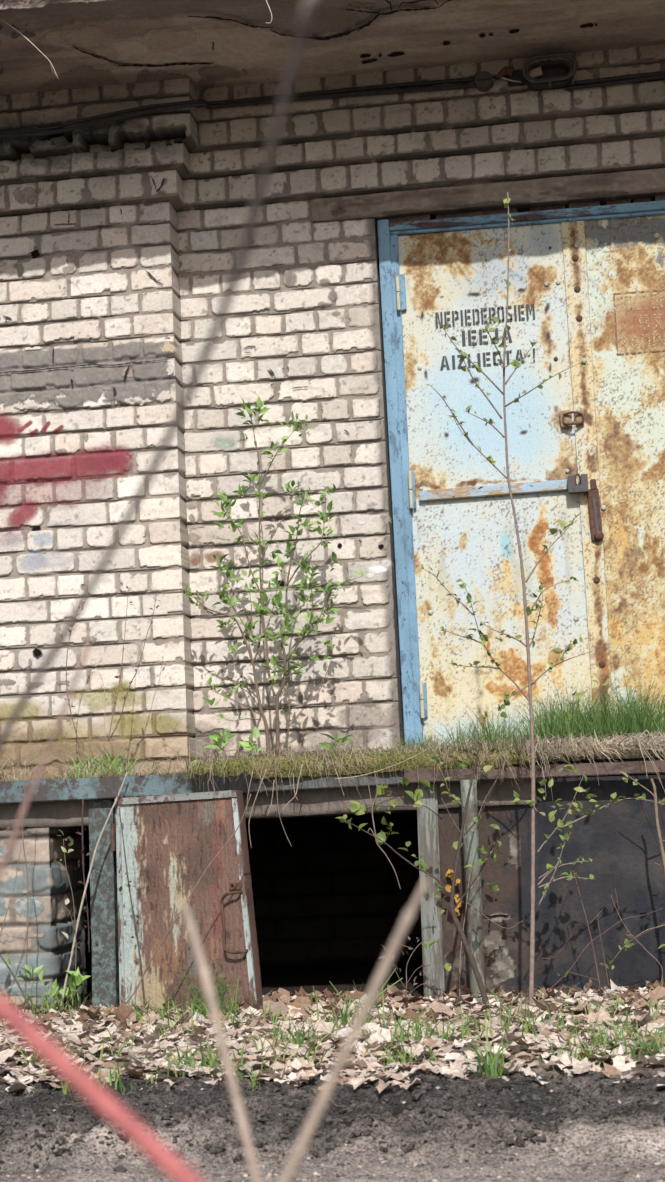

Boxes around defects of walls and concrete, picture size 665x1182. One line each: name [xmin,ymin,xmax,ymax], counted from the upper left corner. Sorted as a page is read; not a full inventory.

crack [73,0,452,67]
spalling [0,341,179,410]
peeling [0,890,45,944]
peeling [0,962,60,996]